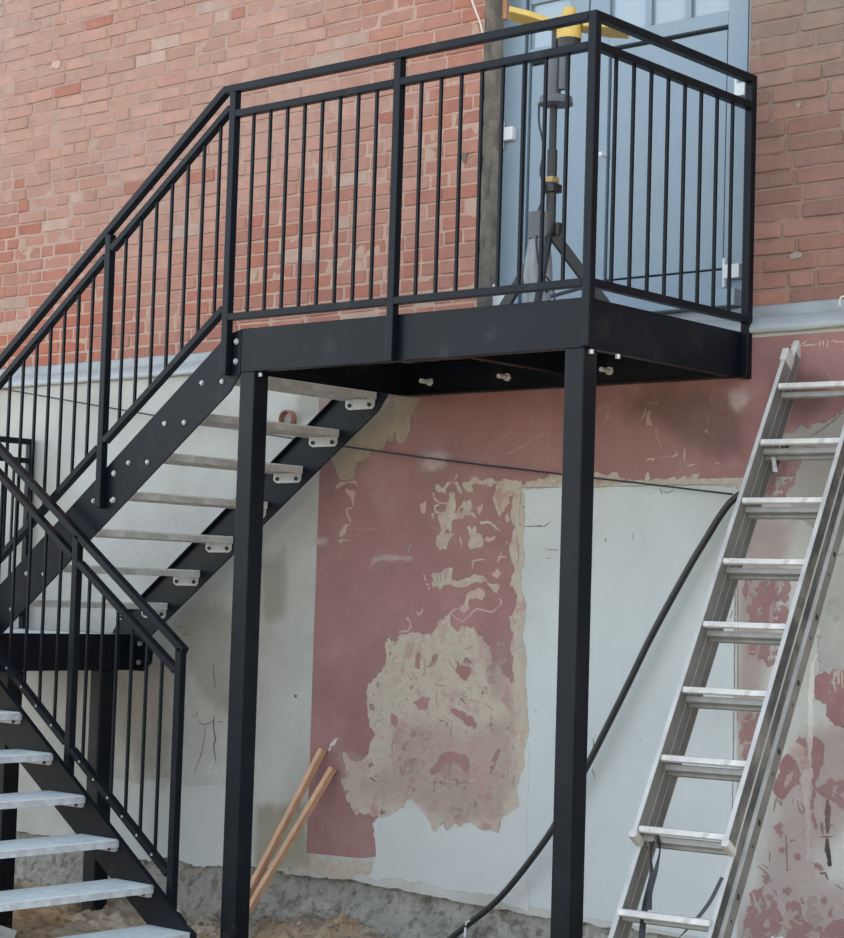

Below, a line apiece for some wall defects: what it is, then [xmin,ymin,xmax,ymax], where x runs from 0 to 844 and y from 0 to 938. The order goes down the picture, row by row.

peeling [330,396,421,544]
peeling [594,471,743,488]
peeling [341,472,562,833]